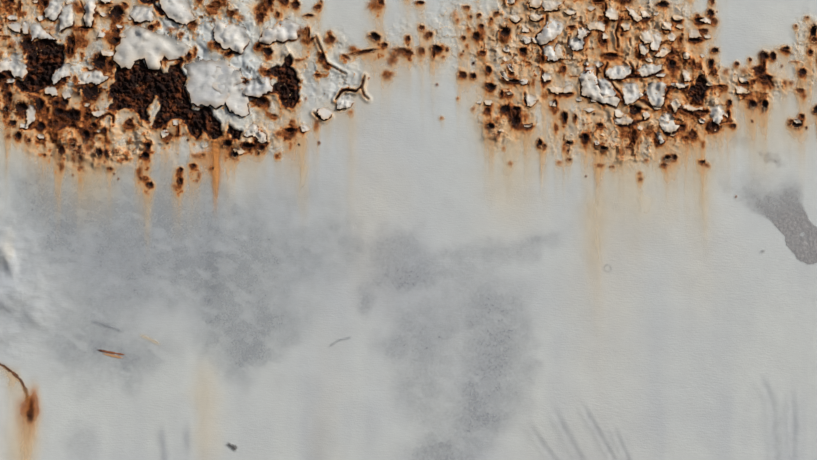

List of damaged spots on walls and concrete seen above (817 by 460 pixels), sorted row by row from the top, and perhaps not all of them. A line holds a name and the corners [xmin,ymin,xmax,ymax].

corrosion [0,0,817,199]
peeling [757,192,817,264]
crack [0,364,39,439]